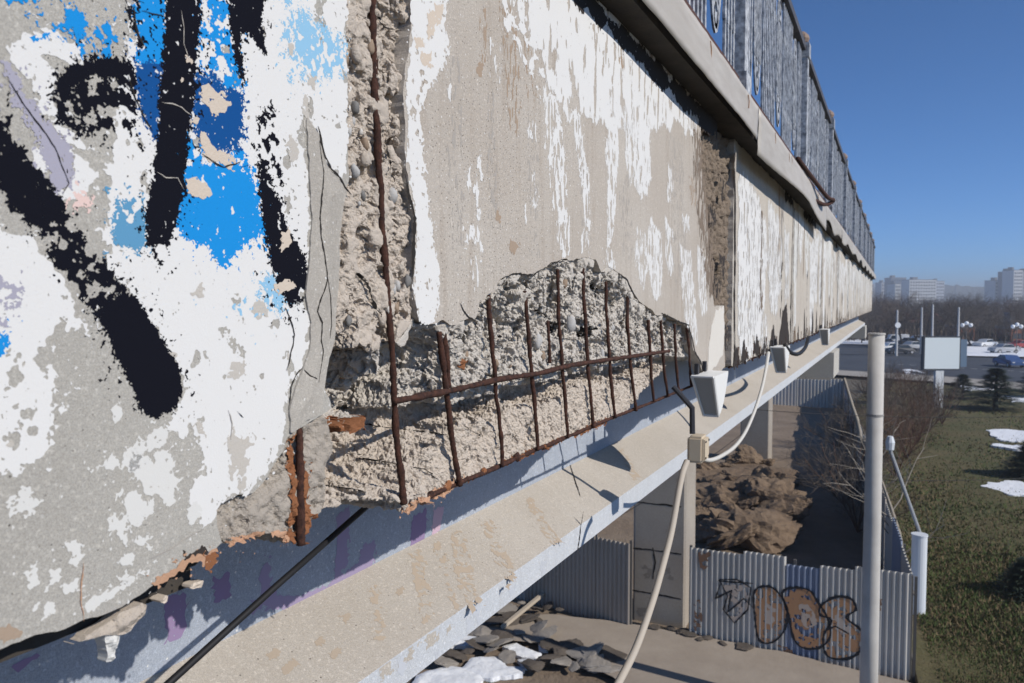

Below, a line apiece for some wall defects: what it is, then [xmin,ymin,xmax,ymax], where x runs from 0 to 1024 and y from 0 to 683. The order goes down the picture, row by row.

crack [285,127,352,410]
spalling [0,0,872,622]
rust [147,428,332,589]
rust [325,414,366,442]
rust [400,467,487,518]
rust [504,417,607,466]